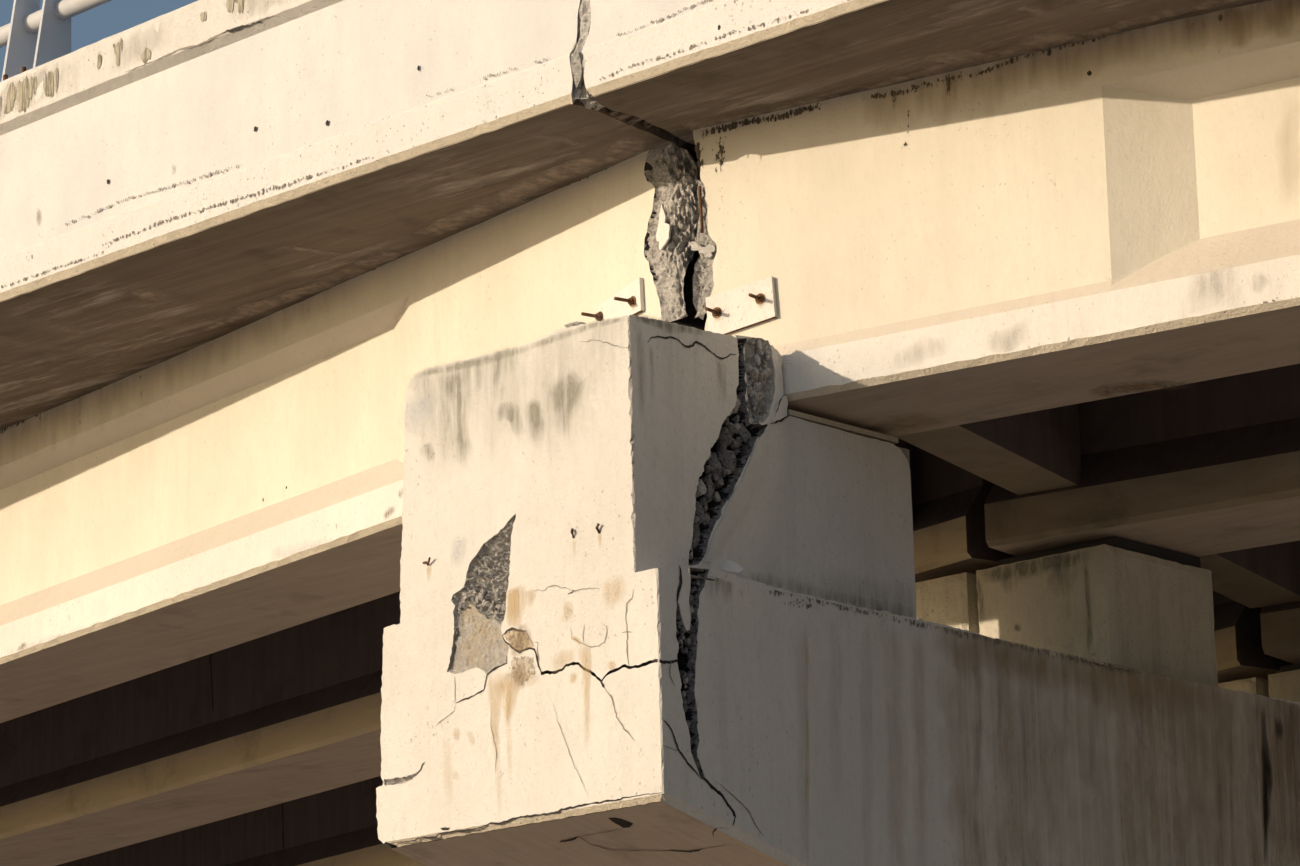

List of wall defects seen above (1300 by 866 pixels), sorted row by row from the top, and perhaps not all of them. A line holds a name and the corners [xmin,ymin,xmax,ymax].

crack [571,0,591,102]
damp [683,93,841,172]
damp [863,0,1239,146]
spalling [644,143,717,322]
damp [428,354,501,446]
damp [530,404,540,430]
spalling [447,513,536,685]
crack [382,335,790,852]
damp [1254,695,1300,866]